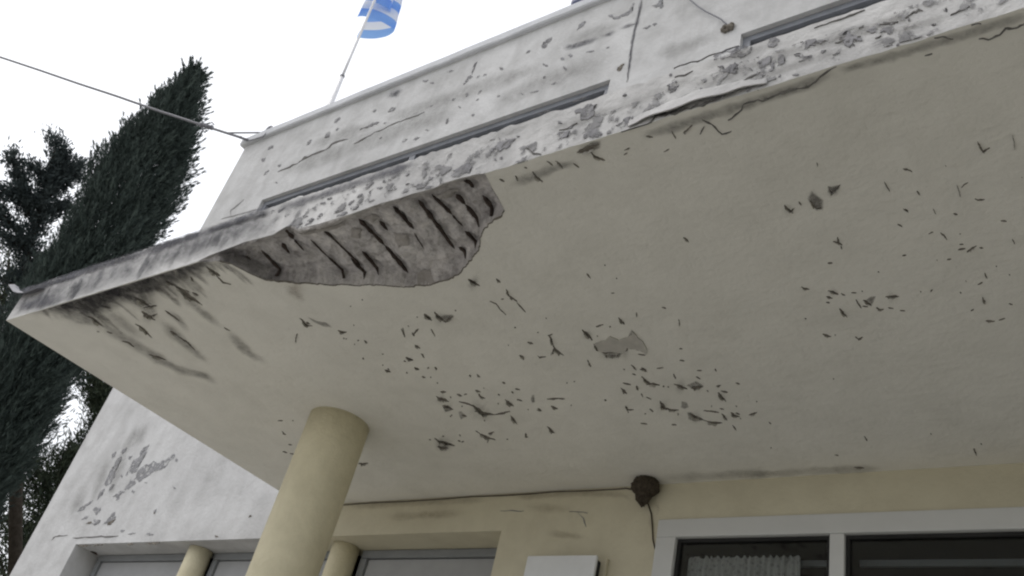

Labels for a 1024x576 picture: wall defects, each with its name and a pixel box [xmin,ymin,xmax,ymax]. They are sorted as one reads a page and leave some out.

crack [621,0,923,135]
crack [278,112,424,172]
spalling [197,0,1006,288]
peeling [826,290,905,318]
peeling [401,310,572,443]
peeling [582,318,757,430]
peeling [77,444,178,546]